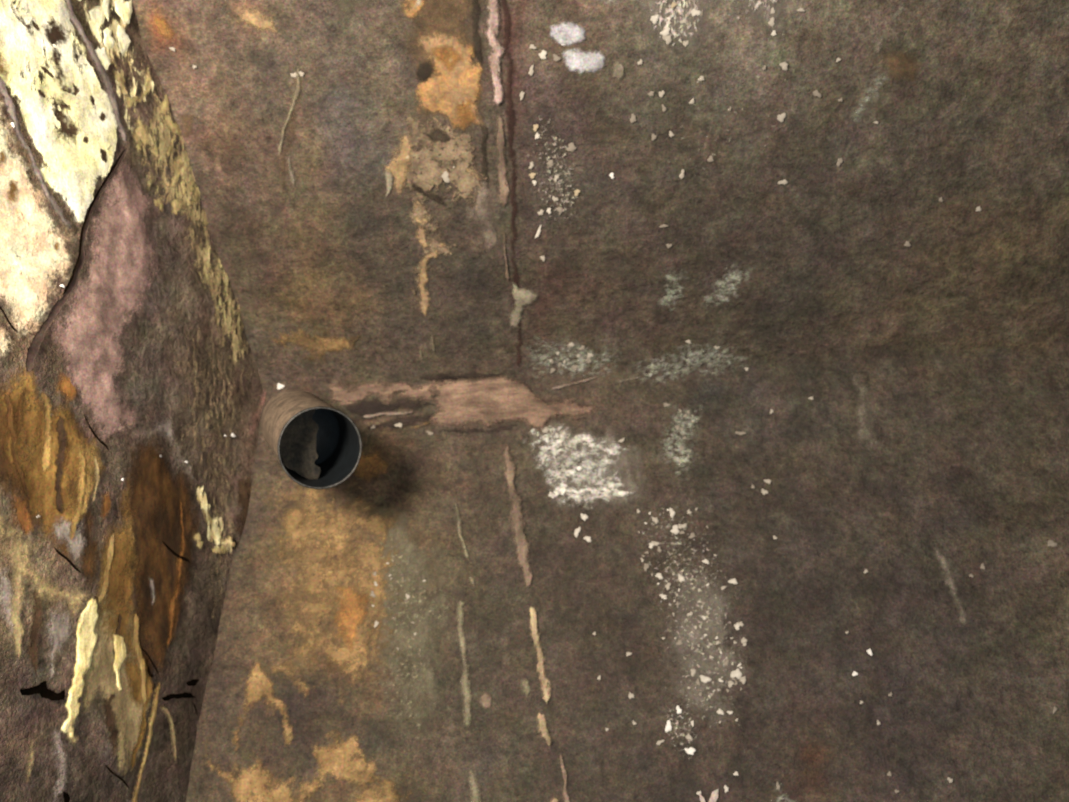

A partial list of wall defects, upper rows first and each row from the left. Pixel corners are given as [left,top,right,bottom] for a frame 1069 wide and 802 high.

corrosion [401,0,489,198]
corrosion [501,0,518,310]
damp [643,0,713,47]
peeling [0,0,250,617]
corrosion [413,200,444,316]
corrosion [0,369,199,672]
damp [329,376,640,542]
damp [663,402,698,473]
damp [370,523,446,726]
damp [637,508,748,755]
corrosion [210,732,400,802]